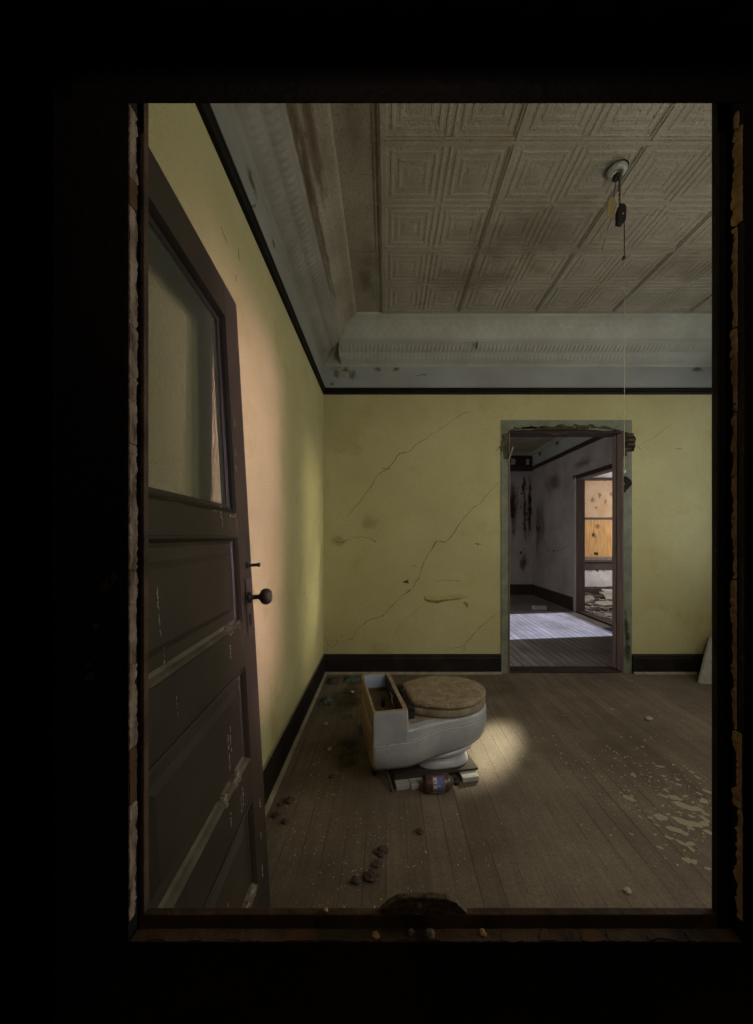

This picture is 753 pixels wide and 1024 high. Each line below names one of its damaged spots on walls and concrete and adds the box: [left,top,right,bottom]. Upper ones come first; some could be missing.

crack [327,481,500,646]
damp [510,478,540,545]
flaking render [497,424,636,467]
peeling [729,110,743,921]